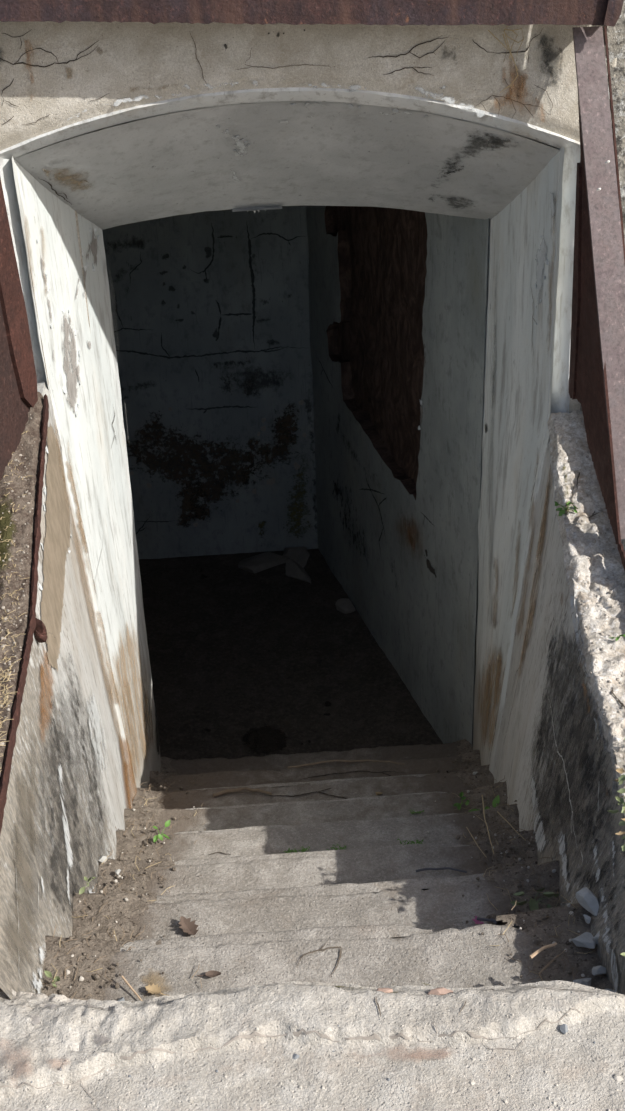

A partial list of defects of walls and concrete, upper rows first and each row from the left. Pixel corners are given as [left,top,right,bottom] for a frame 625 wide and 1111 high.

crack [0,29,98,125]
crack [369,30,553,118]
leakage [539,35,563,85]
leakage [444,134,510,177]
peeling [41,259,91,417]
peeling [76,227,100,296]
crack [114,222,332,385]
peeling [125,400,306,527]
rust [478,652,503,744]
leakage [7,654,103,994]
leakage [531,619,625,992]